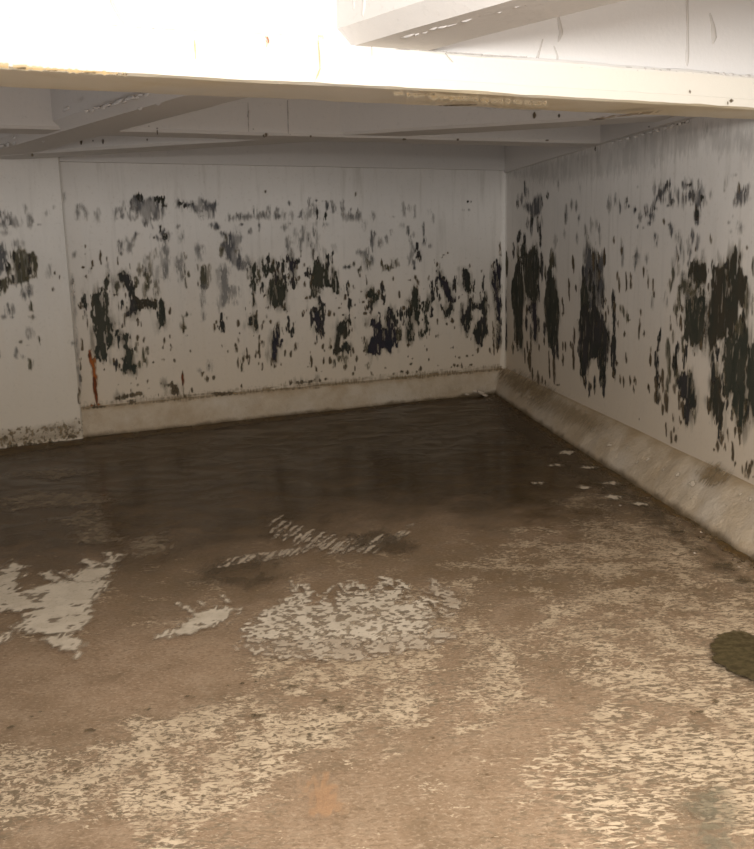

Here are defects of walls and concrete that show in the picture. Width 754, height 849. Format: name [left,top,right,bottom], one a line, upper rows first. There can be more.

damp [0,245,38,318]
damp [115,193,183,278]
damp [177,199,280,306]
damp [344,231,397,285]
damp [407,223,431,270]
damp [516,181,549,235]
damp [608,180,704,265]
damp [736,183,747,205]
rust [88,350,100,406]
damp [160,379,357,402]
damp [494,394,699,526]
damp [709,534,754,564]